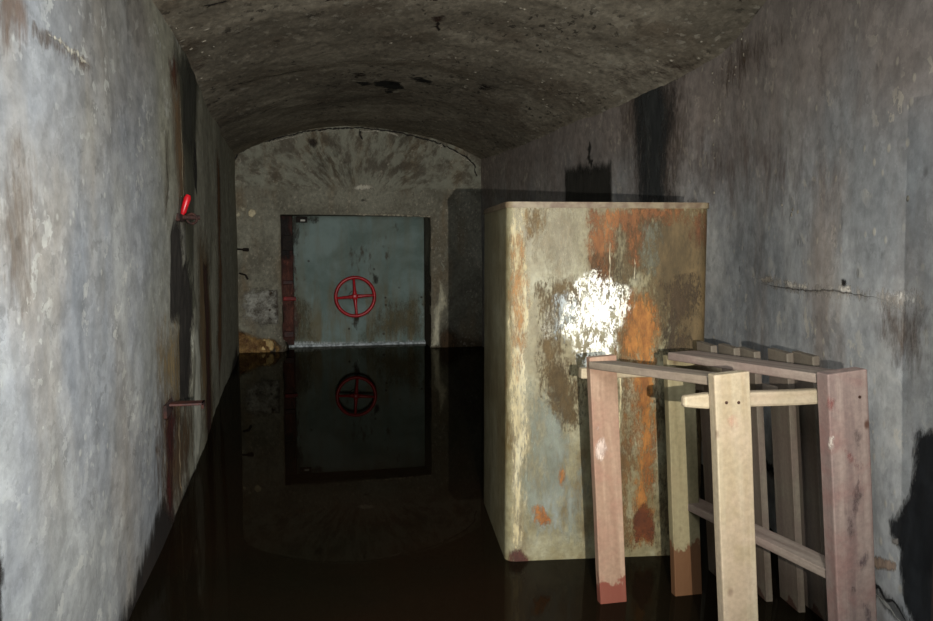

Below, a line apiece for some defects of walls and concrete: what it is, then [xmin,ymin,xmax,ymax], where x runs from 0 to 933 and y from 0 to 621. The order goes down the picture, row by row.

leakage [629,82,681,202]
peeling [541,269,630,367]
corrosion [508,208,707,433]
crack [761,283,876,298]
corrosion [156,395,193,524]
corrosion [533,505,551,525]
corrosion [618,377,670,556]